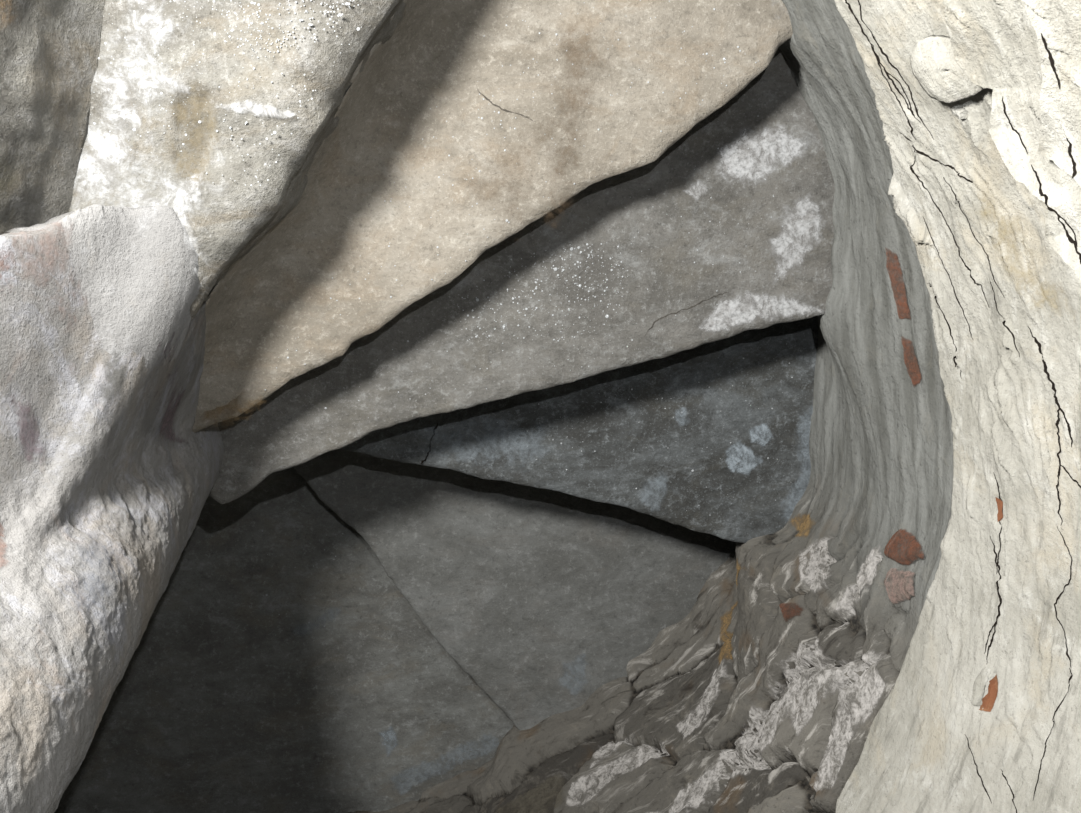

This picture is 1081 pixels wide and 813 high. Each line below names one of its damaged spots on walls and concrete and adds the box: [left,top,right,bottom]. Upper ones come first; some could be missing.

crack [479,92,527,118]
damp [720,127,806,180]
damp [771,199,820,276]
damp [702,293,822,331]
crack [845,0,1081,813]